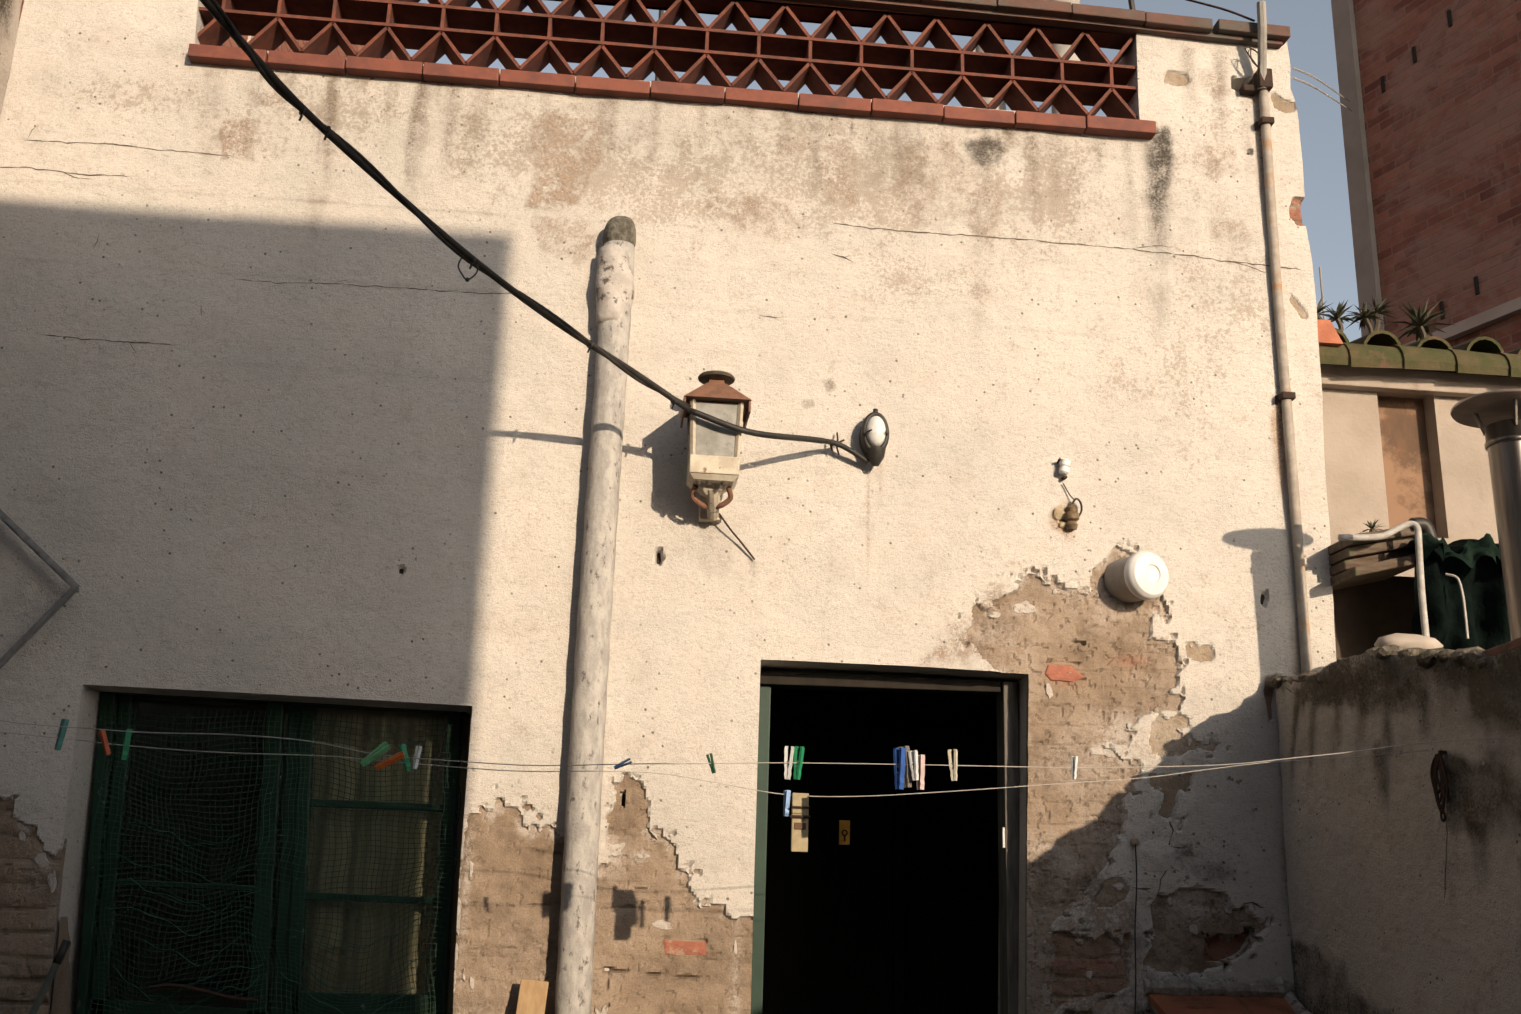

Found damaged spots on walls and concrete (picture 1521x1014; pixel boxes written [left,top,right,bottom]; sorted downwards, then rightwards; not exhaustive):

crack [0,125,234,179]
crack [833,223,1304,273]
water stain [1151,128,1171,225]
flaking render [926,546,1265,1014]
water stain [1292,647,1521,792]
water stain [1445,756,1521,842]
flaking render [0,796,71,1014]
flaking render [453,799,564,1014]
flaking render [590,773,753,1014]